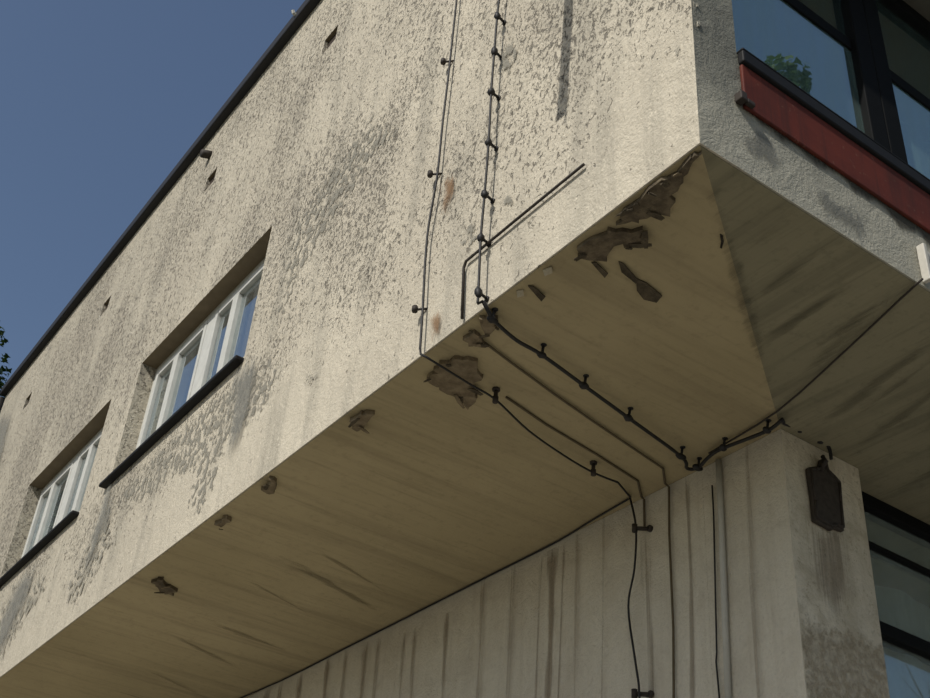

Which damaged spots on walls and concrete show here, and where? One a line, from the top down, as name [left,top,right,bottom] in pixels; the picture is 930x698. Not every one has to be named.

spalling [574,150,702,278]
flaking render [619,261,662,303]
spalling [424,314,499,410]
spalling [348,409,375,434]
flaking render [67,354,280,603]